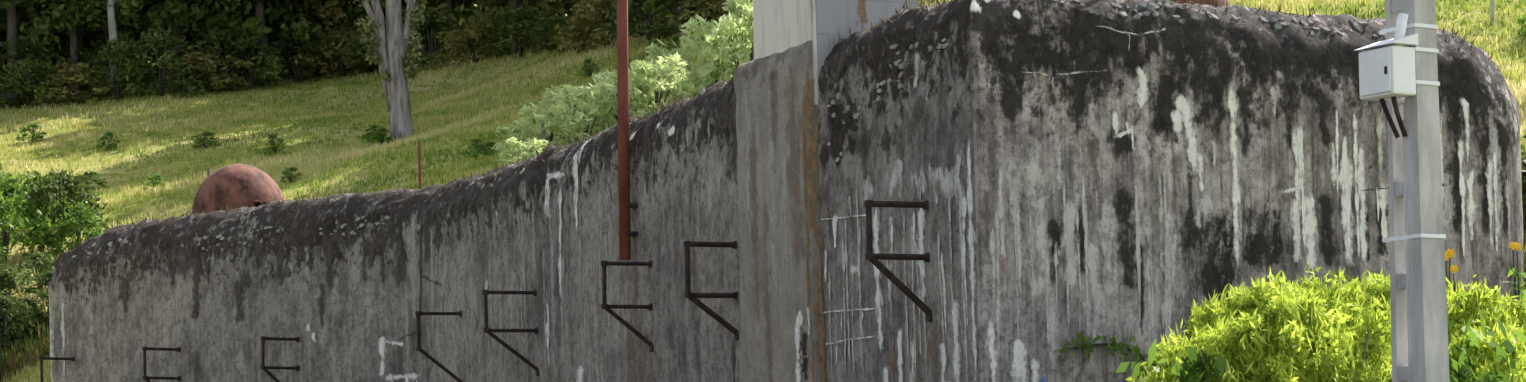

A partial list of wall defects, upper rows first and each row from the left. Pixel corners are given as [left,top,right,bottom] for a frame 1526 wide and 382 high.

water stain [1440,84,1510,256]
water stain [167,262,210,319]
water stain [306,243,337,343]
water stain [795,309,810,382]